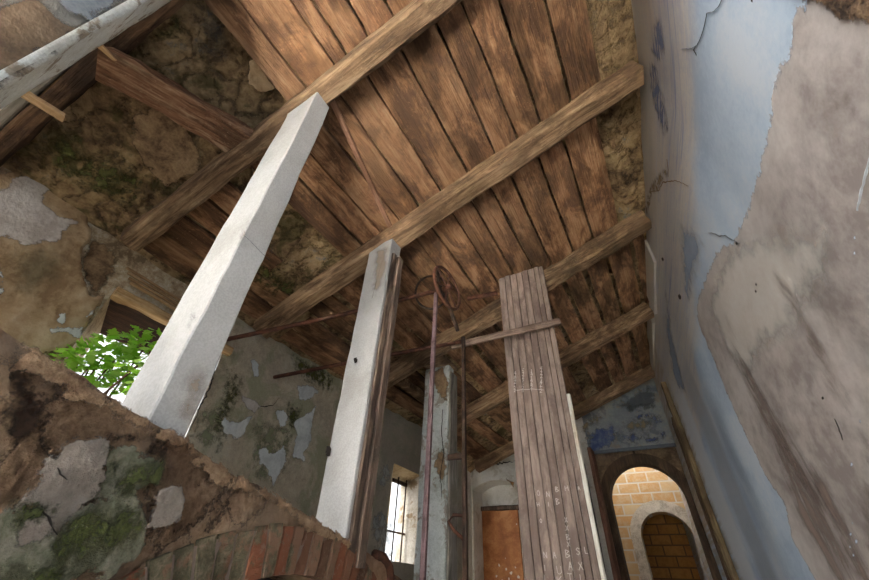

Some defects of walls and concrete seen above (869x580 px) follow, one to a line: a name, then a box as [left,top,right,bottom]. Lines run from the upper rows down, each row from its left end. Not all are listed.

crack [682,0,722,54]
flaking render [0,172,115,353]
peeling [697,0,869,580]
flaking render [0,433,185,580]
peeling [221,396,261,439]
peeling [259,385,318,486]
peeling [429,367,449,400]
peeling [434,449,447,480]